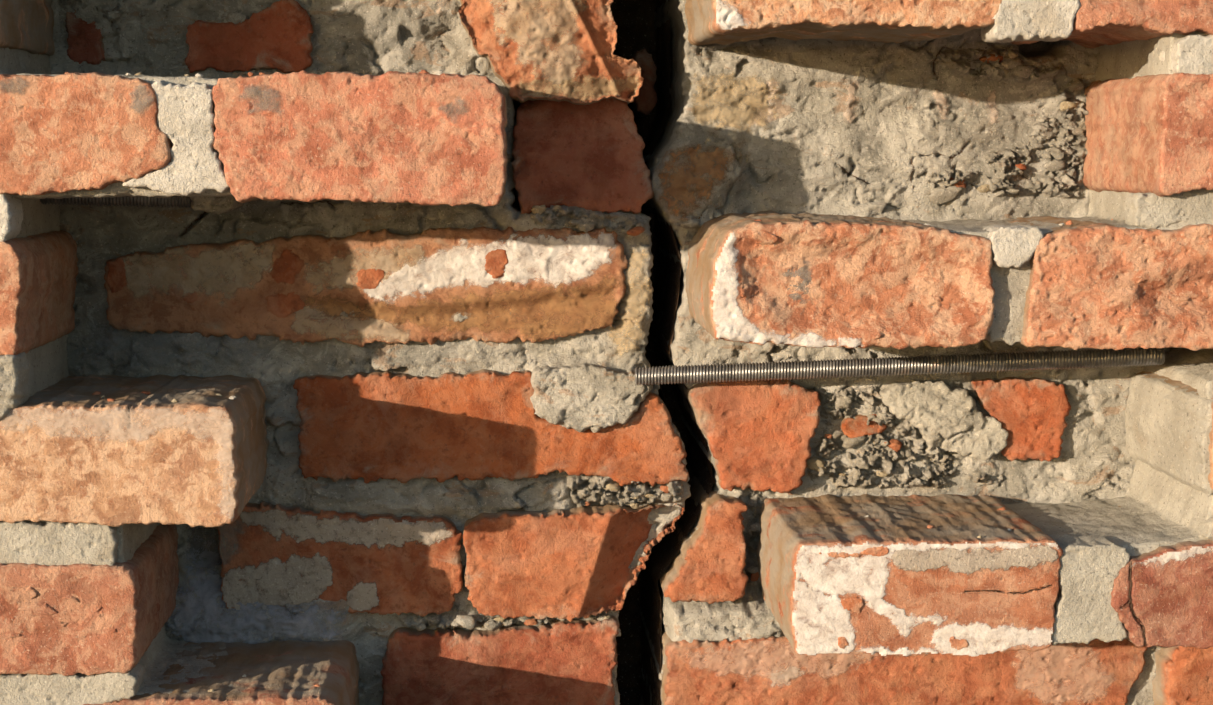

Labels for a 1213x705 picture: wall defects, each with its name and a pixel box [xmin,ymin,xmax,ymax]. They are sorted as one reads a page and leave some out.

crack [610,0,671,164]
spalling [923,48,1089,204]
peeling [356,268,385,289]
peeling [484,249,508,279]
spalling [807,379,1009,490]
crack [615,203,715,705]
spalling [567,474,685,509]
peeling [819,546,889,559]
spalling [395,610,613,632]
peeling [840,597,864,614]
crack [1121,561,1146,645]
peeling [949,636,969,650]